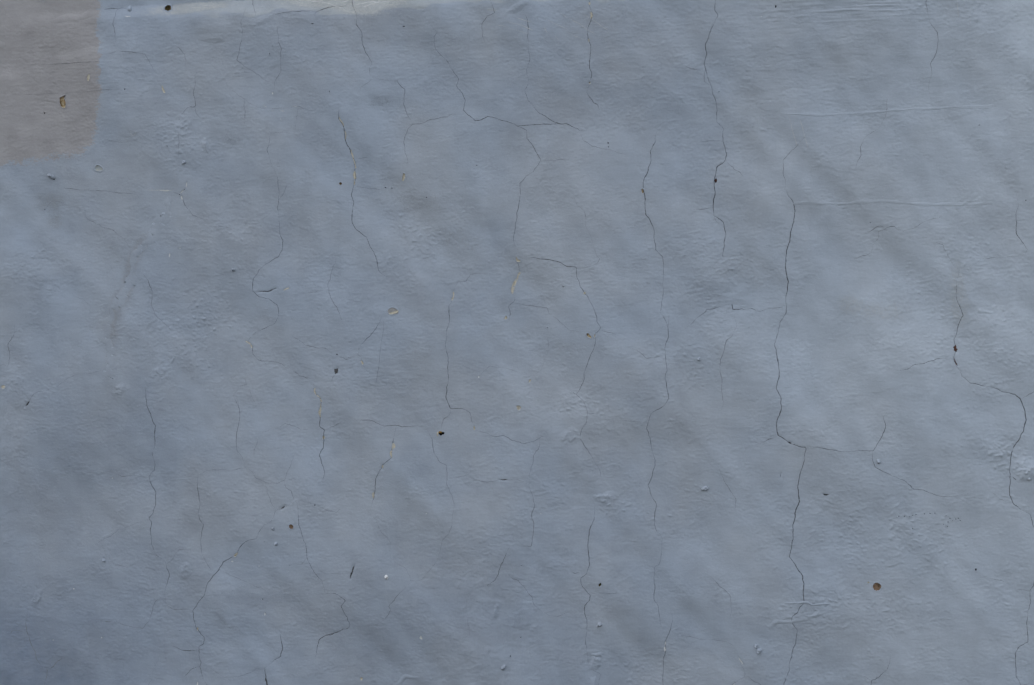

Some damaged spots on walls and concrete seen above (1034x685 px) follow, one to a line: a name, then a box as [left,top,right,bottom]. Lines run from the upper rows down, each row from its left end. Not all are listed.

crack [98,2,669,684]
crack [688,0,739,258]
crack [654,141,945,685]
crack [858,217,1033,525]